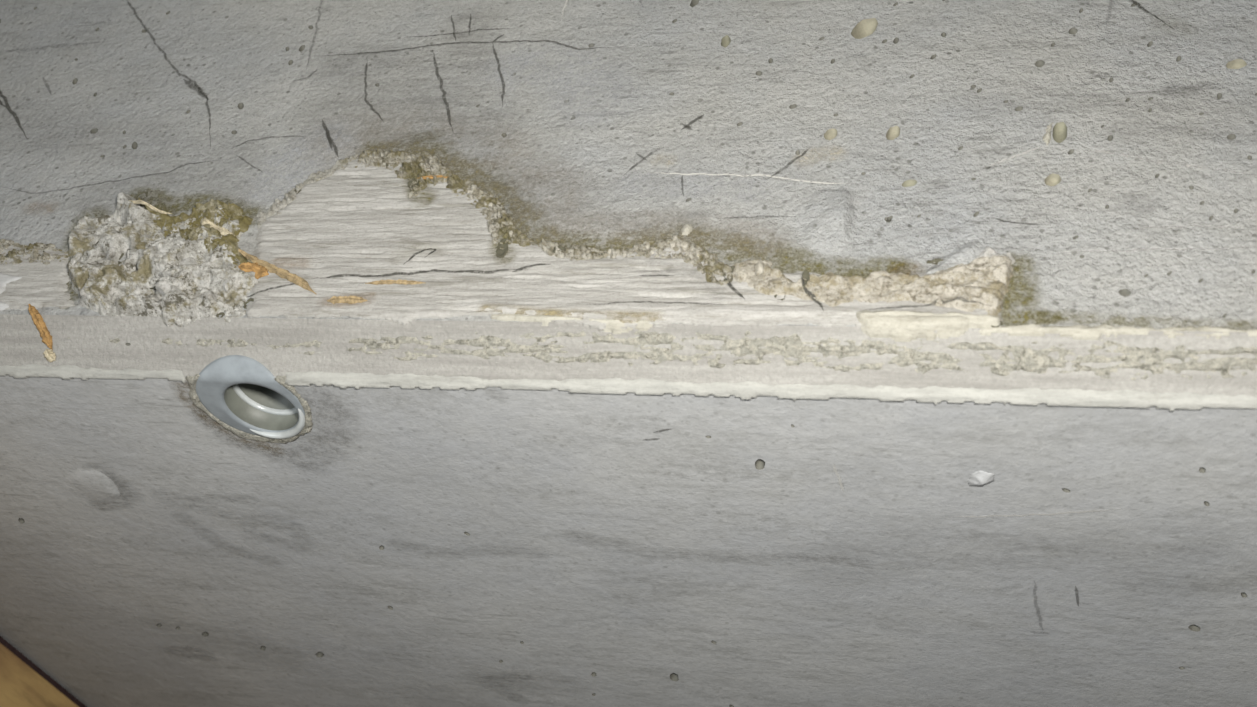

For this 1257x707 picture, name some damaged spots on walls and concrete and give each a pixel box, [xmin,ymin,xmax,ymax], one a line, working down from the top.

spalling [0,239,75,311]
spalling [243,149,1015,342]